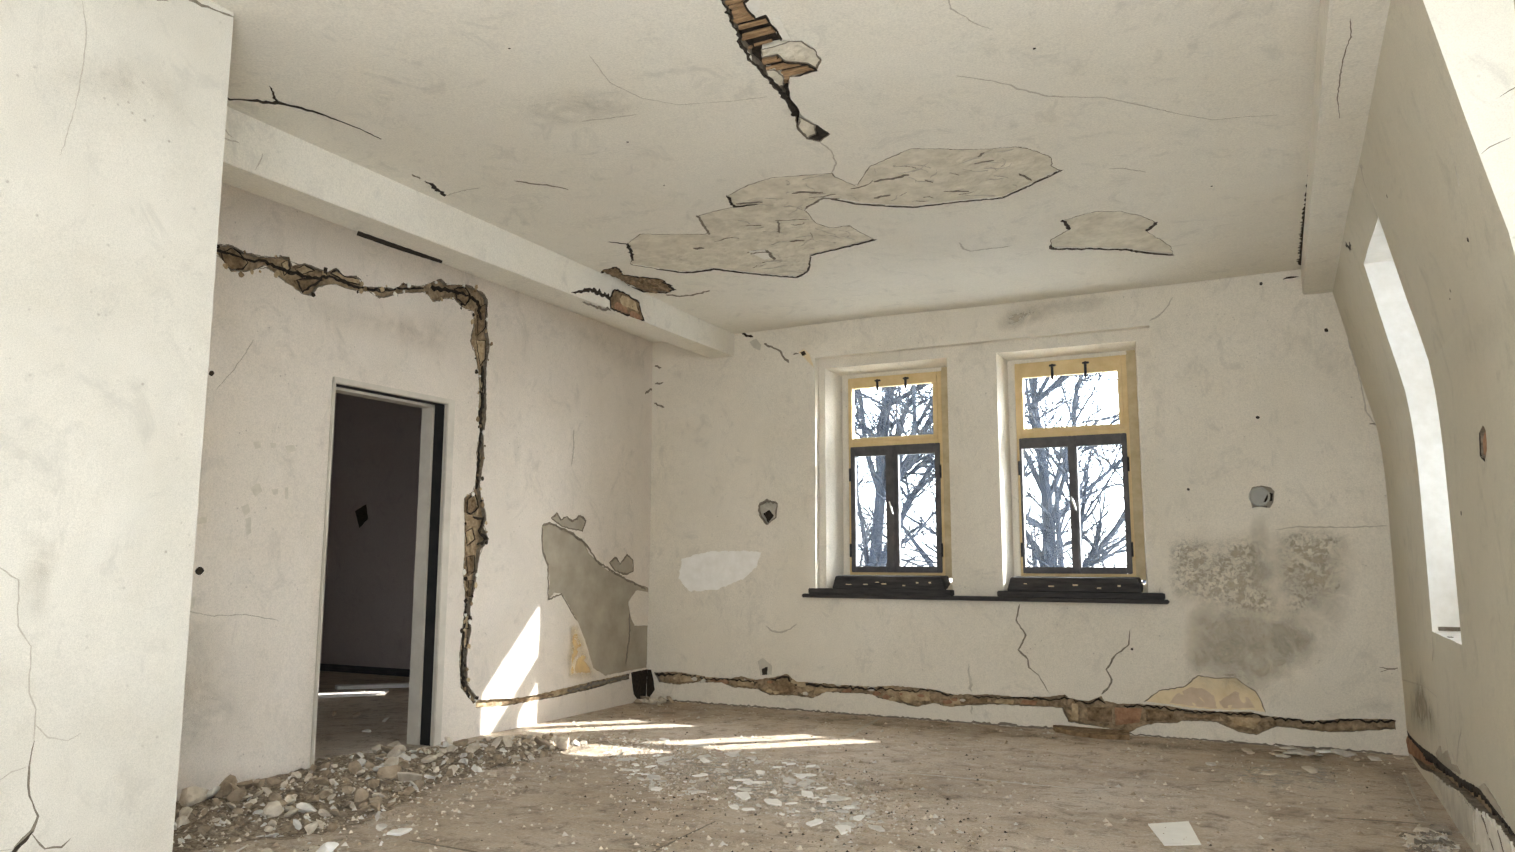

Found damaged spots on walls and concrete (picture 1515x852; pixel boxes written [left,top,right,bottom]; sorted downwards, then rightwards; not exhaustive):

crack [157,0,233,17]
crack [60,0,87,155]
flaking render [571,0,1062,321]
flaking render [1049,211,1174,256]
crack [190,611,278,621]
flaking render [541,513,648,676]
leakage [1178,545,1264,606]
crack [0,567,81,852]
spalling [758,658,772,675]
crack [473,604,1515,852]
peeling [1144,675,1266,712]
peeling [1399,826,1466,852]